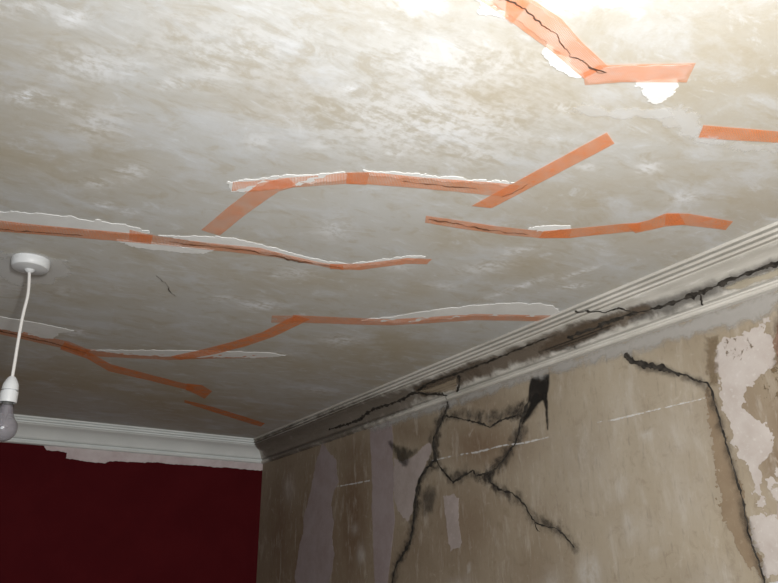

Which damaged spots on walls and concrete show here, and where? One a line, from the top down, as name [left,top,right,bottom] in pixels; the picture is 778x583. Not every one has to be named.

crack [506,0,607,73]
crack [430,219,524,234]
crack [328,261,778,583]
peeling [705,317,778,580]